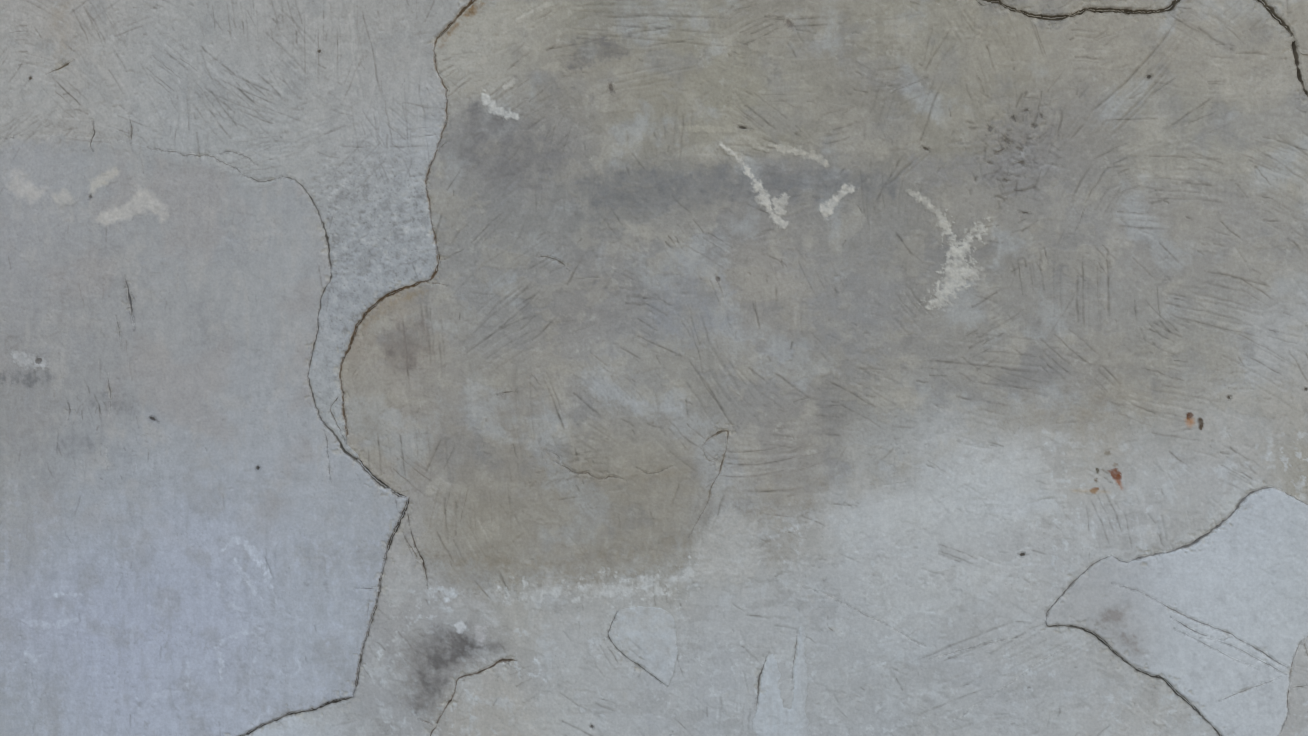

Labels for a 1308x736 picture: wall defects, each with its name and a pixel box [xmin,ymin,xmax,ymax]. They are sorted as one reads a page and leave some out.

crack [973,0,1182,23]
crack [1253,0,1308,101]
crack [89,119,97,152]
peeling [0,0,474,736]
crack [128,0,477,736]
water stain [368,304,448,381]
water stain [393,358,1195,666]
peeling [610,606,678,686]
crack [417,657,517,736]